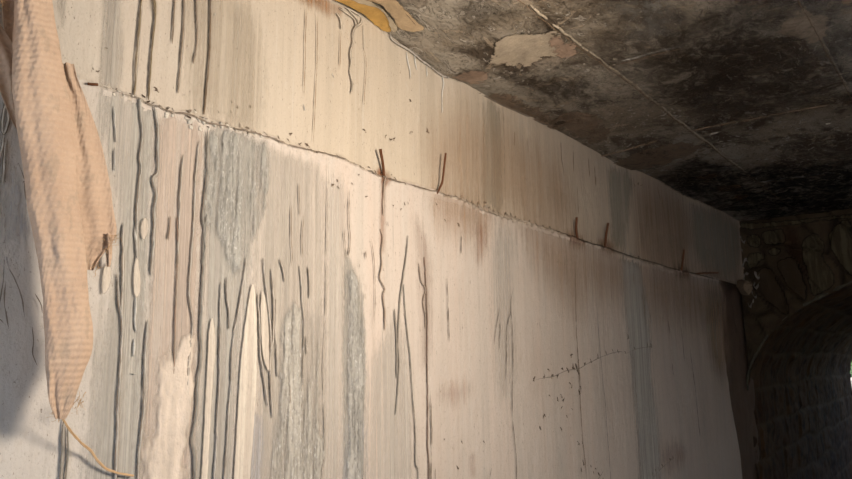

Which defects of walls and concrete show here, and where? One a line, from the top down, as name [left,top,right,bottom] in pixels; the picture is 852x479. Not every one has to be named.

water stain [86,0,156,479]
water stain [191,126,365,479]
crack [323,192,375,382]
corrosion [378,149,387,184]
crack [111,89,718,323]
crack [429,392,437,479]
crack [494,292,517,479]
peeling [454,31,579,129]
crack [536,313,651,479]
peeling [779,3,830,43]